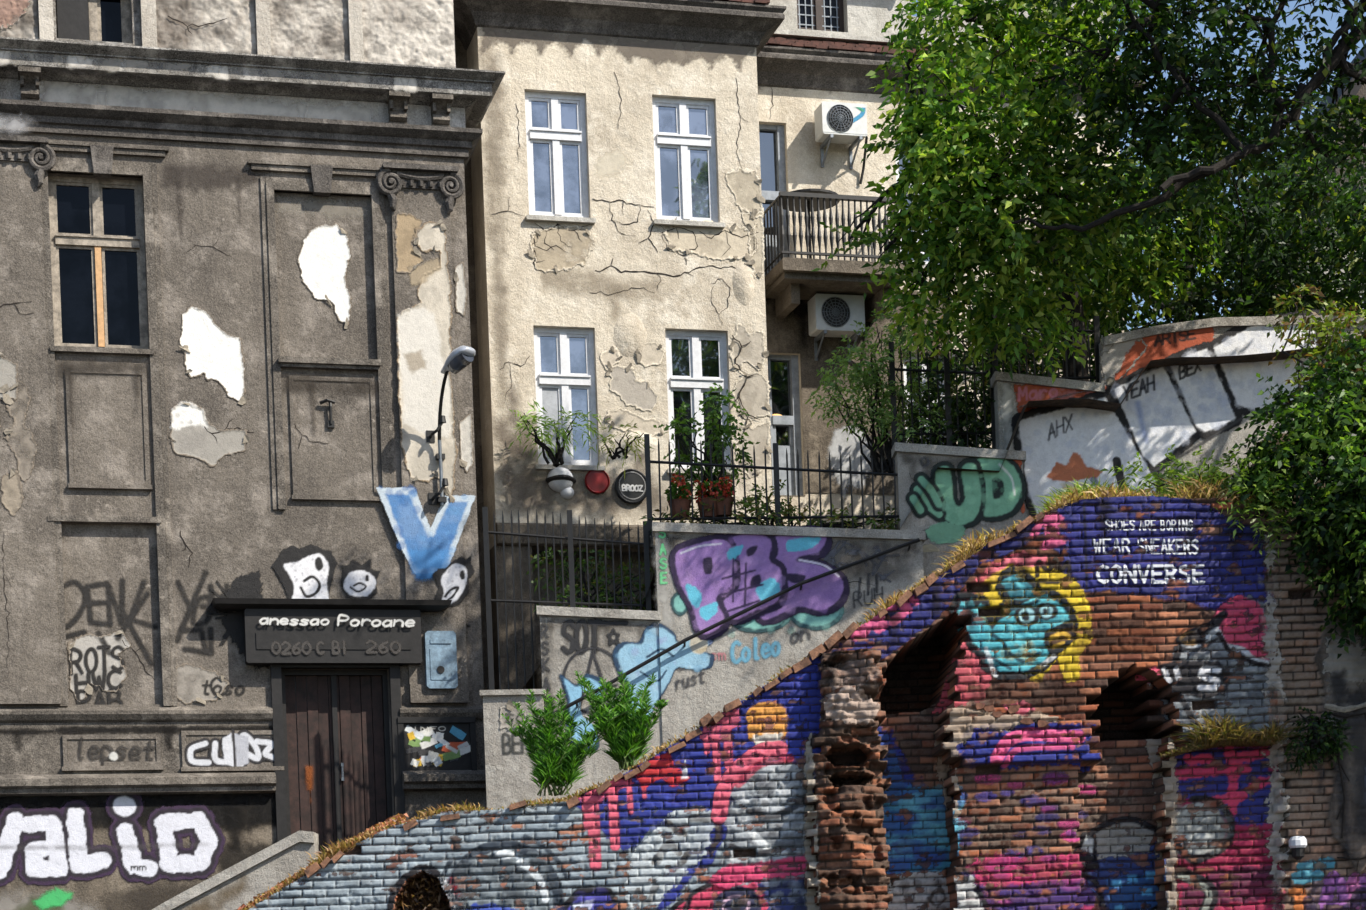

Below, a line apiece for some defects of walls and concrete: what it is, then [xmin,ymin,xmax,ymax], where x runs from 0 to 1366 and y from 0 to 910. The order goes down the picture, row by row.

peeling [0,352,38,516]
peeling [169,402,250,467]
peeling [178,305,247,405]
peeling [297,222,352,329]
peeling [394,212,474,503]
peeling [527,224,595,273]
crack [496,197,761,435]
peeling [600,342,666,438]
spalling [819,659,880,726]
spalling [827,749,867,786]